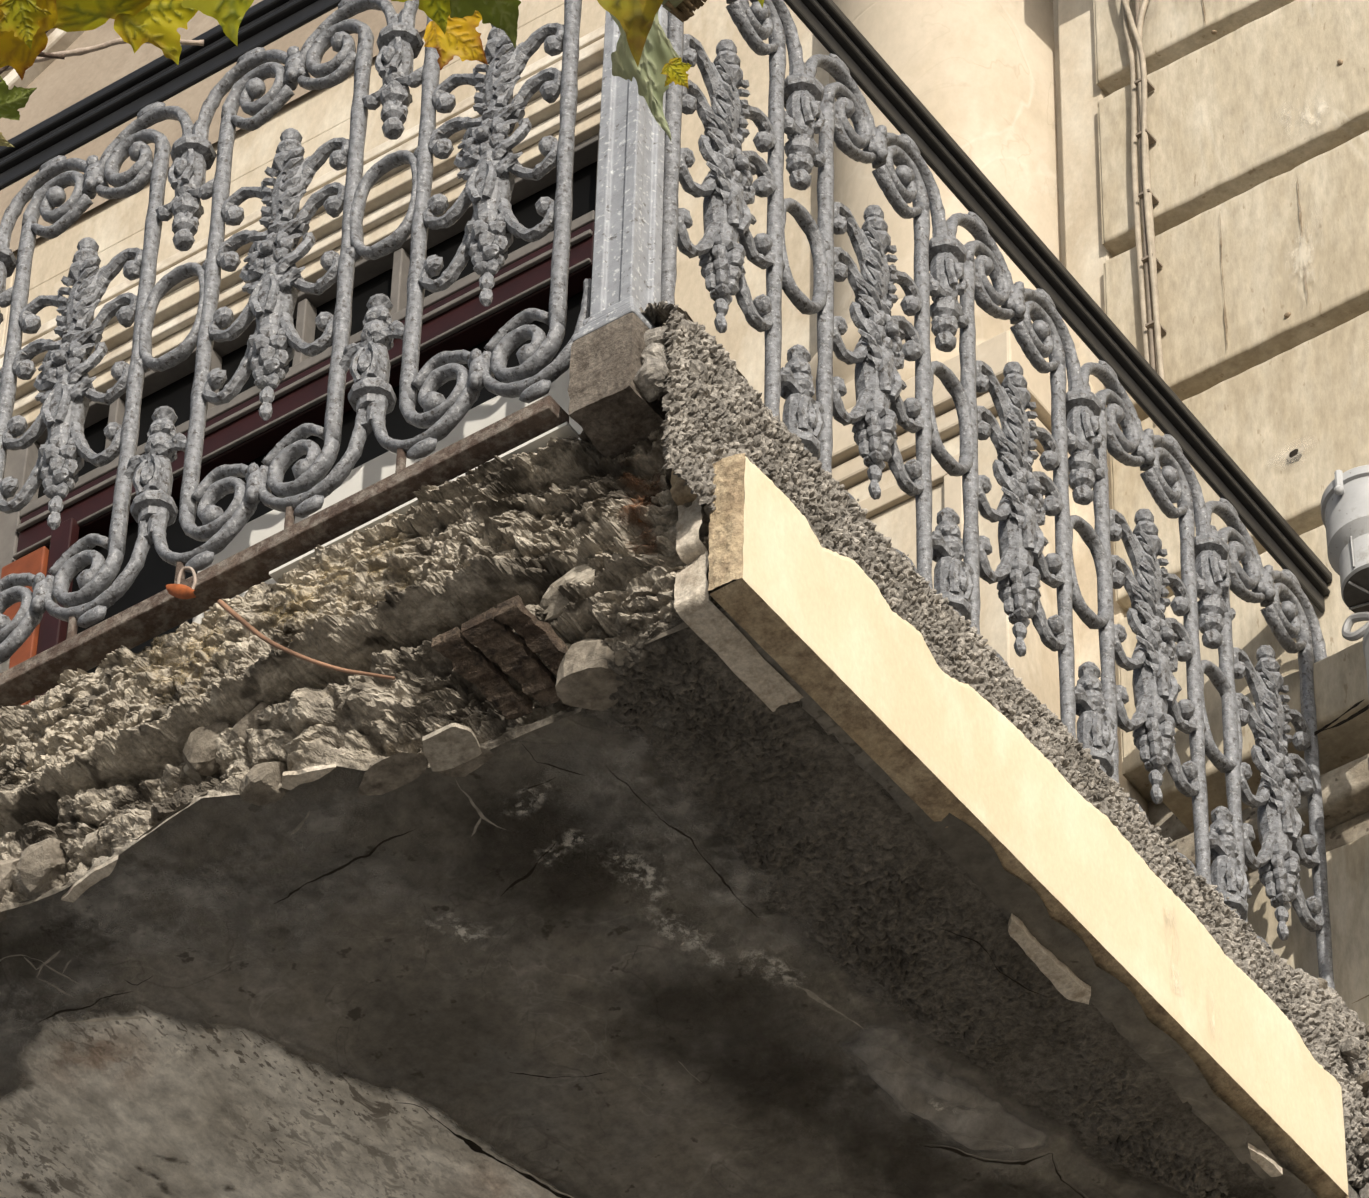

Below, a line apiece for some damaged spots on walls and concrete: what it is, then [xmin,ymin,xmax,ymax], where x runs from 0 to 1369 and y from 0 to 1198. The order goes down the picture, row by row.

spalling [0,300,1369,1198]
leakage [63,859,244,947]
crack [274,828,418,904]
leakage [448,914,484,939]
leakage [463,750,724,964]
crack [521,744,757,917]
leakage [744,952,797,985]
leakage [642,981,1061,1198]
crack [396,1100,574,1198]